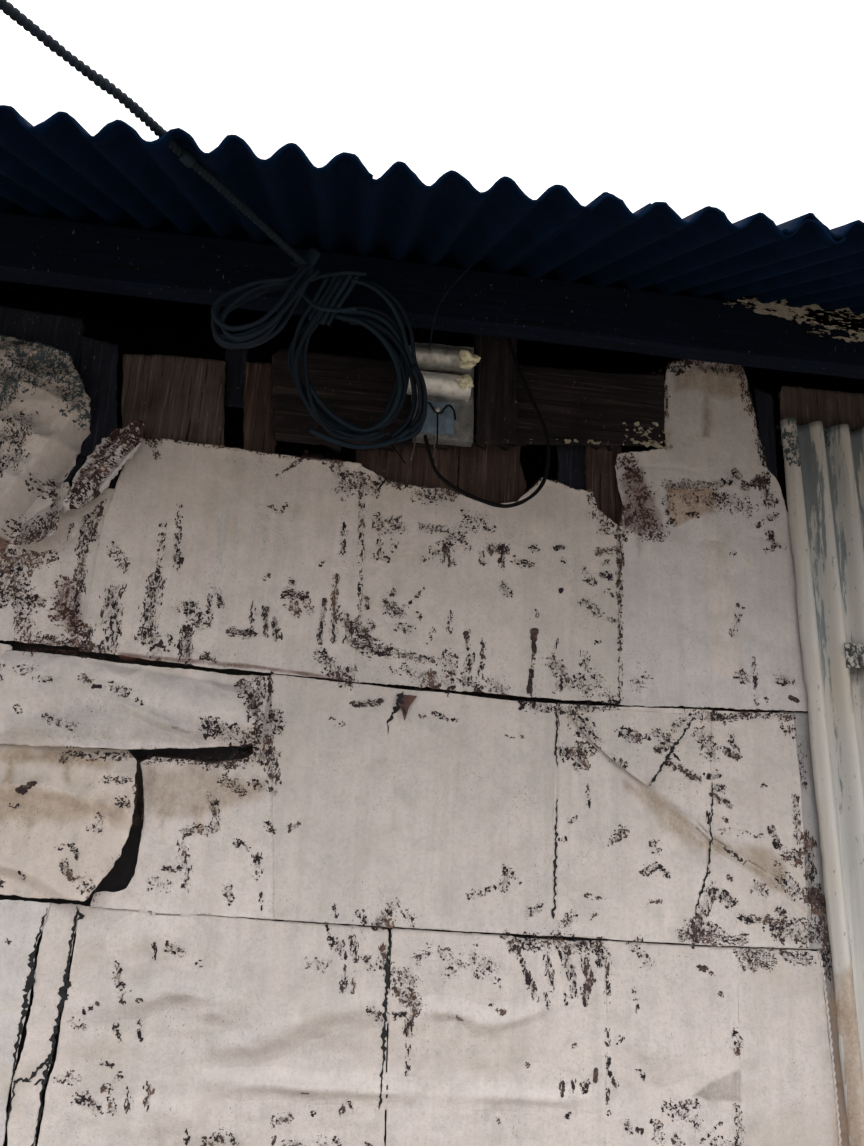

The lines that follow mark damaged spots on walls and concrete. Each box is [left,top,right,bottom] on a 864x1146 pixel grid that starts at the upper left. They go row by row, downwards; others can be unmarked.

peeling [723,297,864,343]
peeling [0,335,832,981]
crack [552,710,560,766]
crack [649,718,694,786]
crack [550,799,558,919]
crack [695,785,714,912]
crack [5,906,85,1146]
peeling [112,960,143,1005]
crack [378,933,392,1109]
peeling [500,892,612,1010]